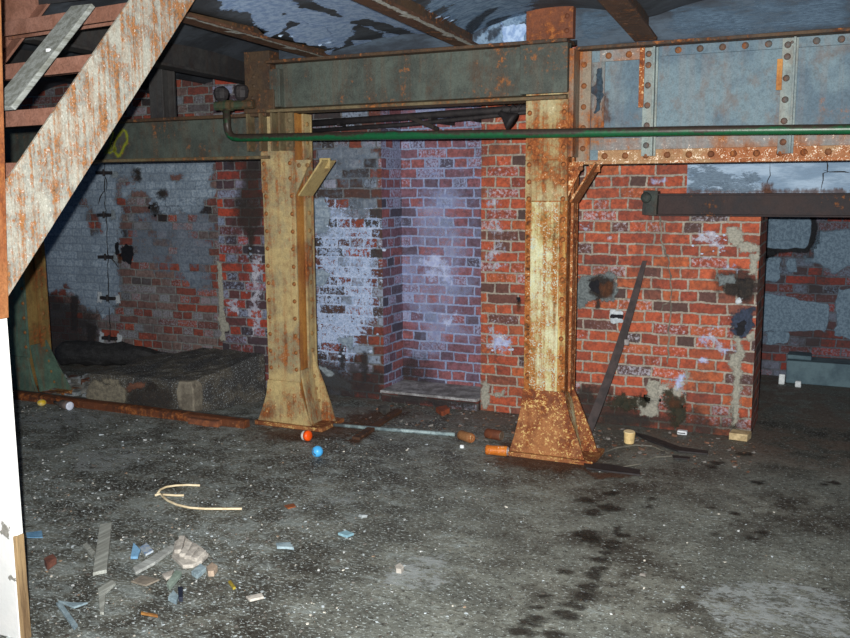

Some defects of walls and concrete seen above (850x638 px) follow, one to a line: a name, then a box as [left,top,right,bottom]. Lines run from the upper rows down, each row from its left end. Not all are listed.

peeling [184,0,541,57]
peeling [44,161,217,319]
peeling [769,219,802,241]
peeling [766,331,790,345]
water stain [580,491,621,516]
water stain [554,526,629,620]
water stain [509,595,566,638]